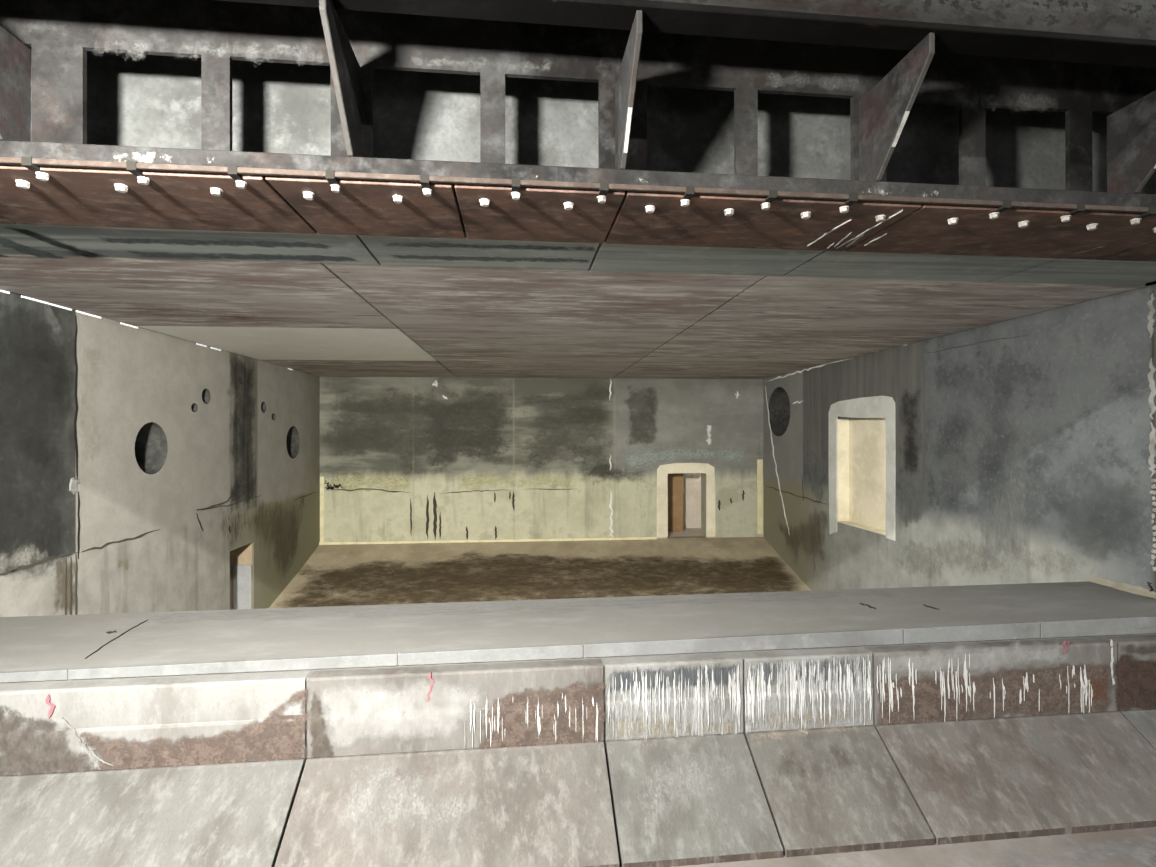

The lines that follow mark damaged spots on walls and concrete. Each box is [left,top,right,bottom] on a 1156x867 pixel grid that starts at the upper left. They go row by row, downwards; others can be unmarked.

crack [196,496,259,532]
crack [0,529,160,575]
leakage [527,657,917,742]